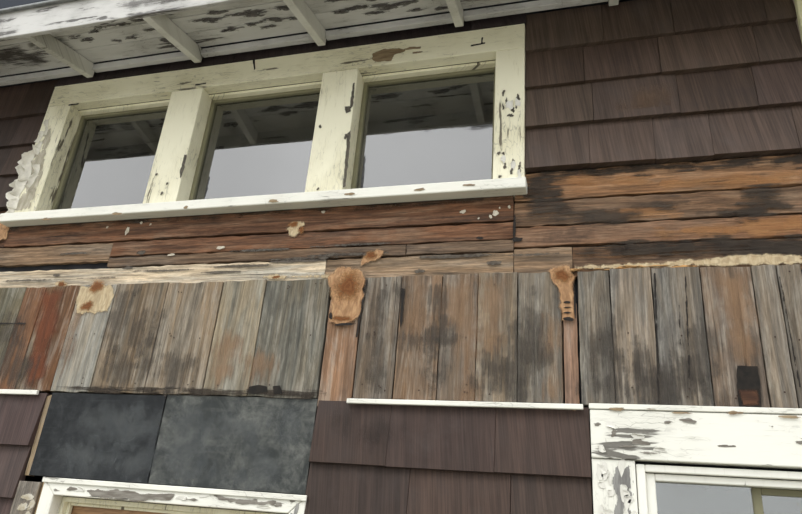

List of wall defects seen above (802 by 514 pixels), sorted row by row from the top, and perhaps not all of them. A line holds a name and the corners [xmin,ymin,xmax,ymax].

water stain [119,0,168,8]
water stain [0,43,46,66]
peeling [372,46,422,62]
peeling [6,119,51,213]
water stain [515,153,802,223]
water stain [354,197,483,207]
water stain [164,209,290,220]
water stain [575,233,802,264]
spalling [664,412,697,424]
peeling [596,444,636,514]
peeling [17,494,35,514]
peeling [54,487,299,514]